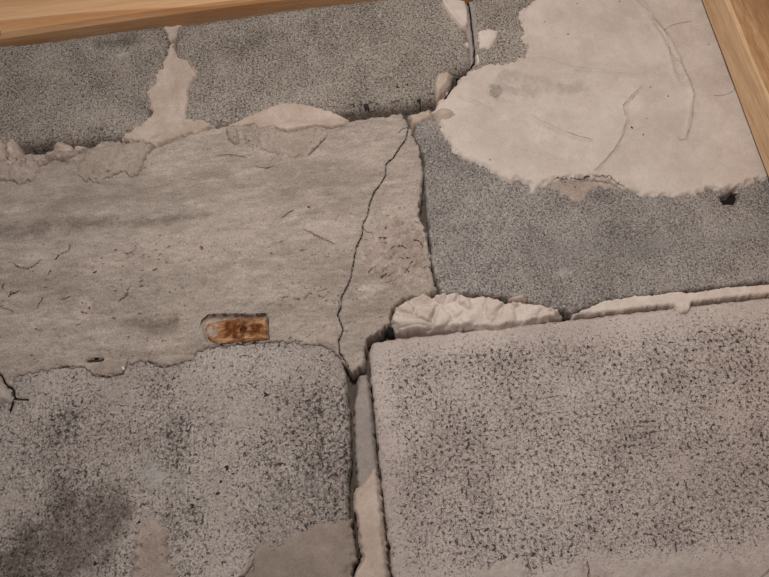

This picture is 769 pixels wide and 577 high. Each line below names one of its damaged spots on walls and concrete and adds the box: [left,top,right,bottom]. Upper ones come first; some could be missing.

flaking render [546,180,623,205]
crack [337,119,408,362]
corrosion [225,320,262,339]
crack [0,374,29,412]